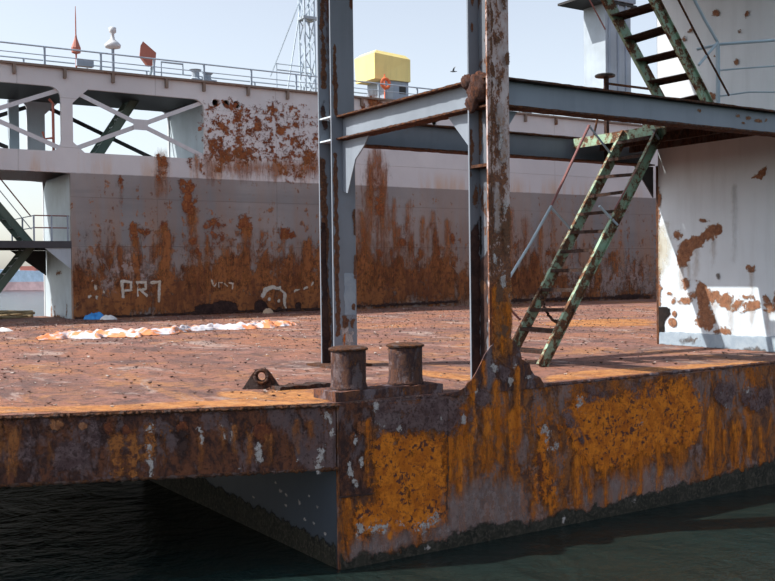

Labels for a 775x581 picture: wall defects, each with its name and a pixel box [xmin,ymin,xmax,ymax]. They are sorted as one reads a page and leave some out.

rust [51,0,341,363]
rust [352,0,555,380]
rust [549,274,580,302]
rust [568,187,775,335]
rust [0,389,327,478]
rust [345,392,522,553]
rust [531,361,773,515]